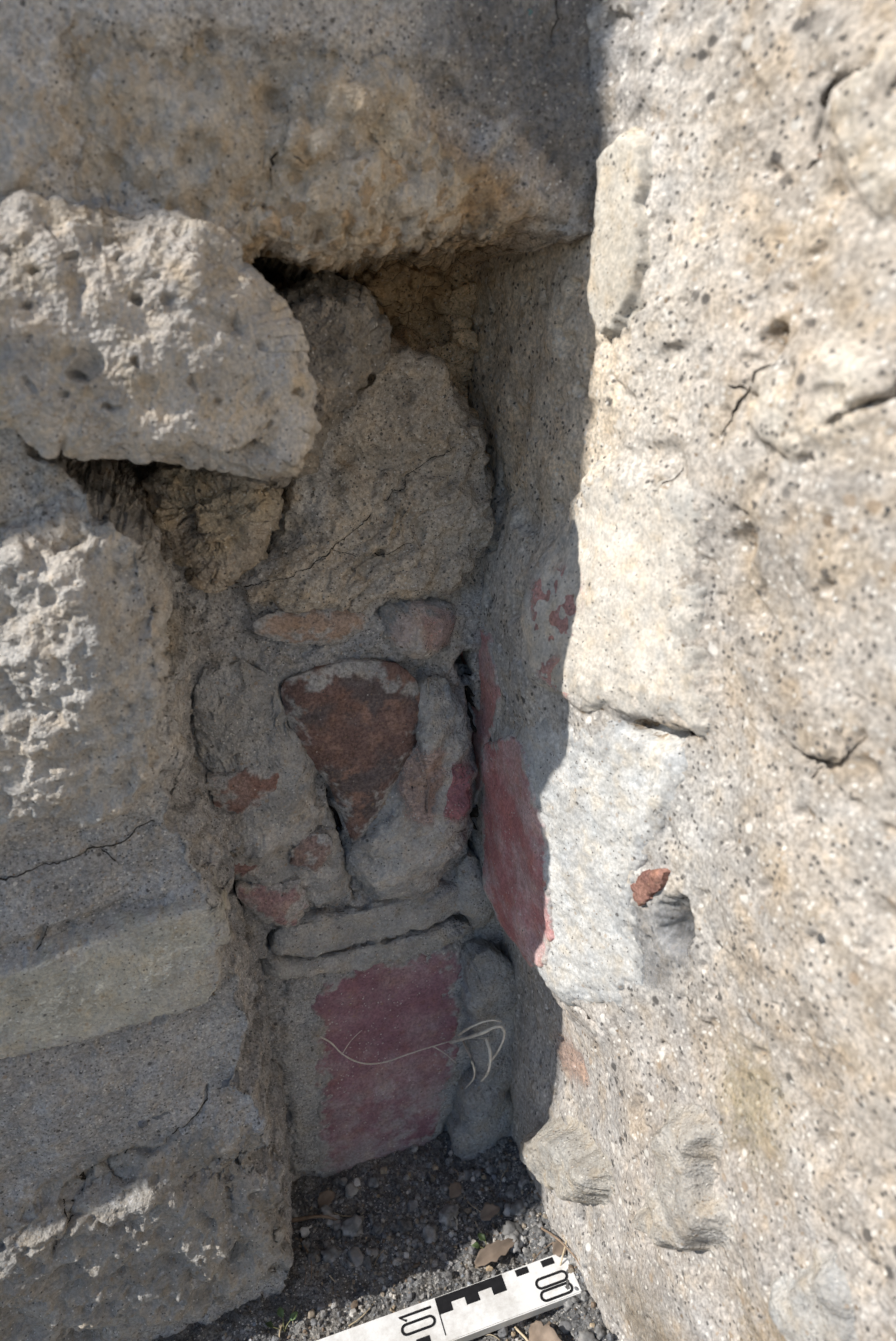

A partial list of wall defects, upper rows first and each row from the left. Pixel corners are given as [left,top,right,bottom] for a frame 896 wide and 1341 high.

crack [826,396,896,423]
flaking render [460,460,712,1008]
crack [0,820,155,881]